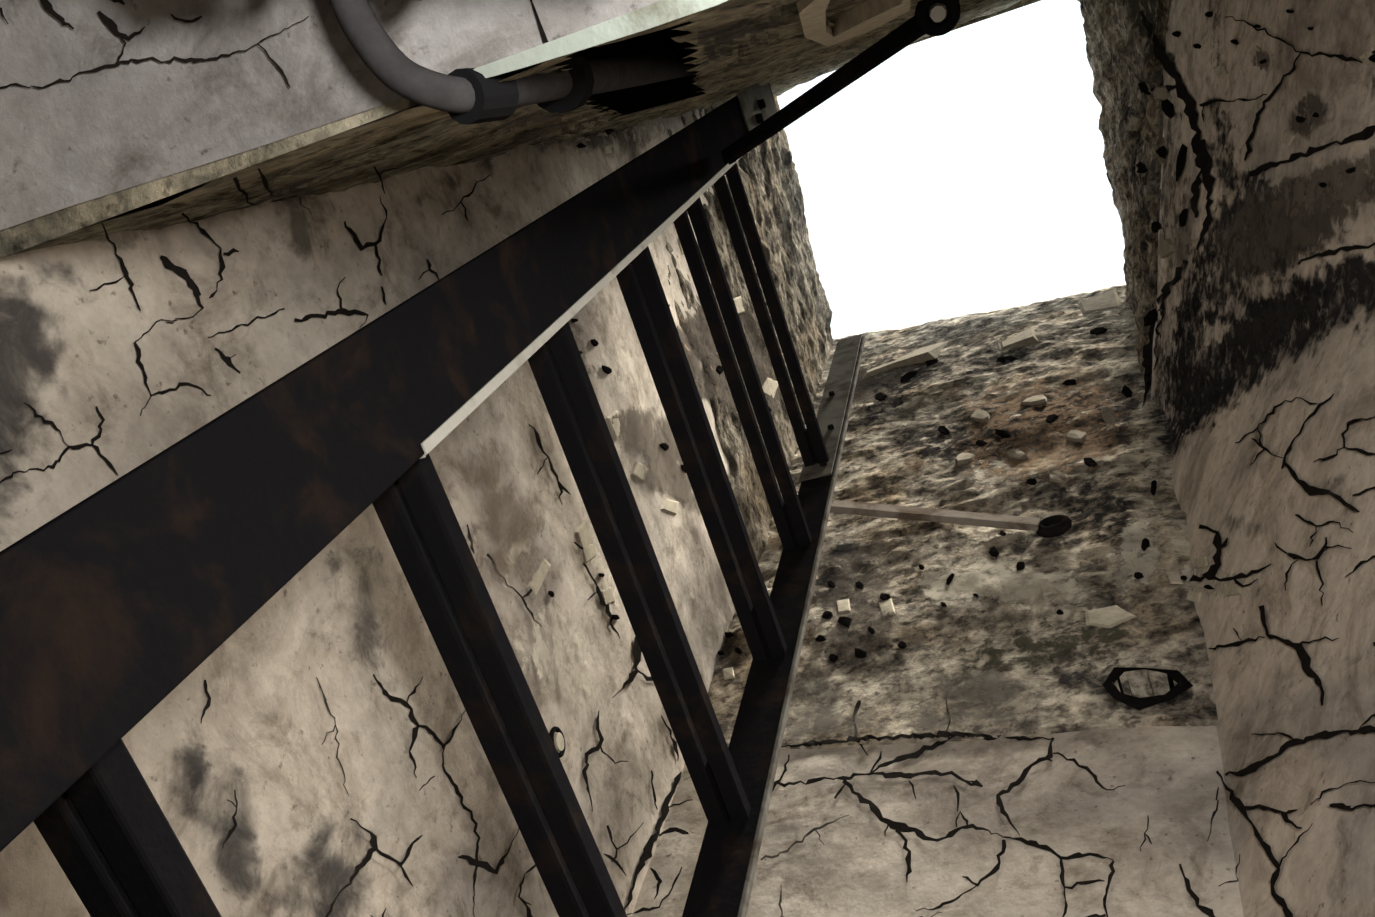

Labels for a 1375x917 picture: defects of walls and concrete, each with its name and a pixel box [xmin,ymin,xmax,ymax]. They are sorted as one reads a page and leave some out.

crack [0,0,309,89]
crack [0,403,118,483]
crack [90,167,395,416]
crack [418,259,439,280]
leakage [849,341,1106,434]
leakage [888,76,1375,487]
crack [1139,10,1375,407]
leakage [915,551,1142,730]
crack [1179,393,1375,917]
crack [373,674,536,917]
crack [760,696,1152,917]